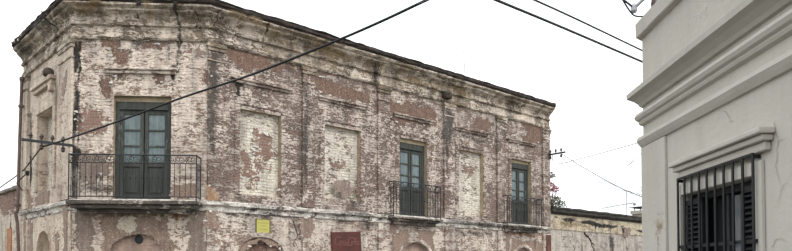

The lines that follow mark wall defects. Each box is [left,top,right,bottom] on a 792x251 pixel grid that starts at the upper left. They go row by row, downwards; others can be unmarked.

peeling [98,40,130,101]
flaking render [225,48,297,74]
flaking render [315,76,371,105]
damp [72,41,110,196]
flaking render [73,105,109,139]
flaking render [390,99,437,141]
flaking render [240,127,278,191]
peeling [328,157,362,200]
peeling [28,190,49,251]
flaking render [54,205,172,251]
flaking render [169,183,223,251]
flaking render [238,237,281,251]